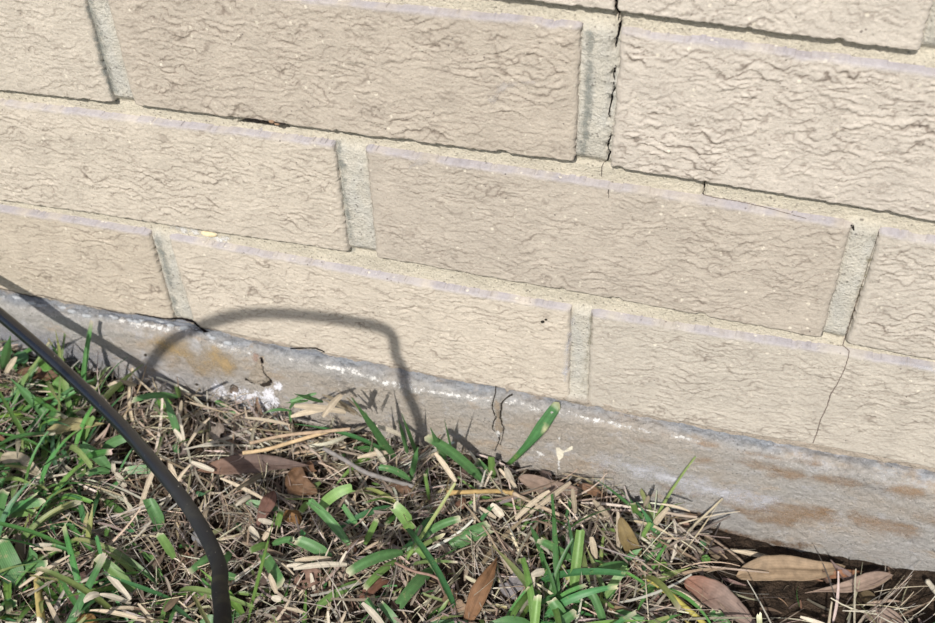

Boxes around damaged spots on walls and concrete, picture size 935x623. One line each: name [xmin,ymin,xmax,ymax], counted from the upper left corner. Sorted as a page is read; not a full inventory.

crack [601,0,622,198]
crack [702,182,807,219]
crack [491,386,513,450]
crack [812,232,879,443]